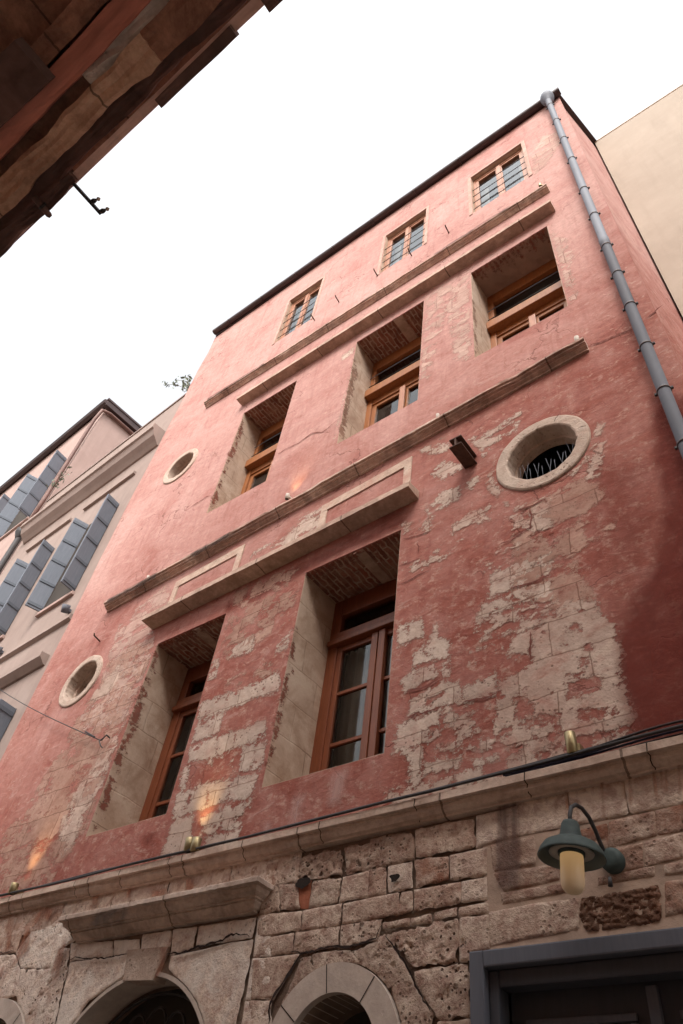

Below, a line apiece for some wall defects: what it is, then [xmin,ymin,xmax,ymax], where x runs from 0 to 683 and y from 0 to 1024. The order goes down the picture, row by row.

peeling [467,411,522,458]
peeling [0,421,648,892]
crack [268,919,431,1022]